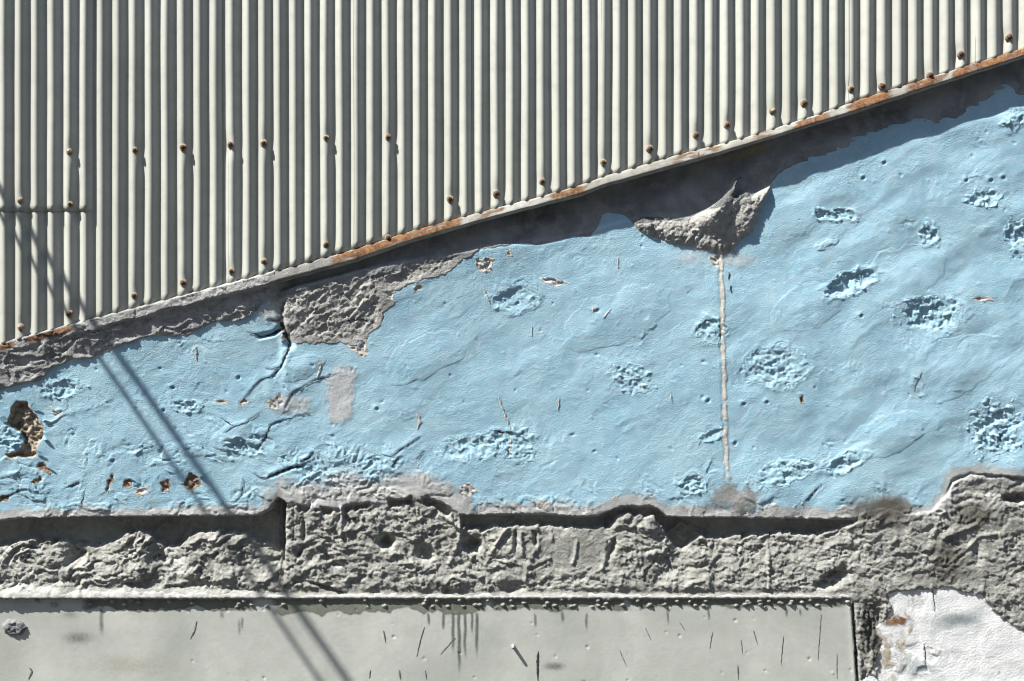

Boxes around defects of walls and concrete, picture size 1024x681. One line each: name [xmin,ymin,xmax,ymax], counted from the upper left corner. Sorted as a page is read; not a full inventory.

corrosion [847,90,891,112]
corrosion [907,48,1024,92]
corrosion [551,186,587,198]
flaking render [263,58,1024,359]
corrosion [330,218,461,264]
crack [223,300,331,448]
crack [696,250,732,479]
spalling [737,342,813,404]
spalling [0,378,90,484]
hole [434,424,541,465]
spalling [967,396,1024,463]
crack [234,454,312,502]